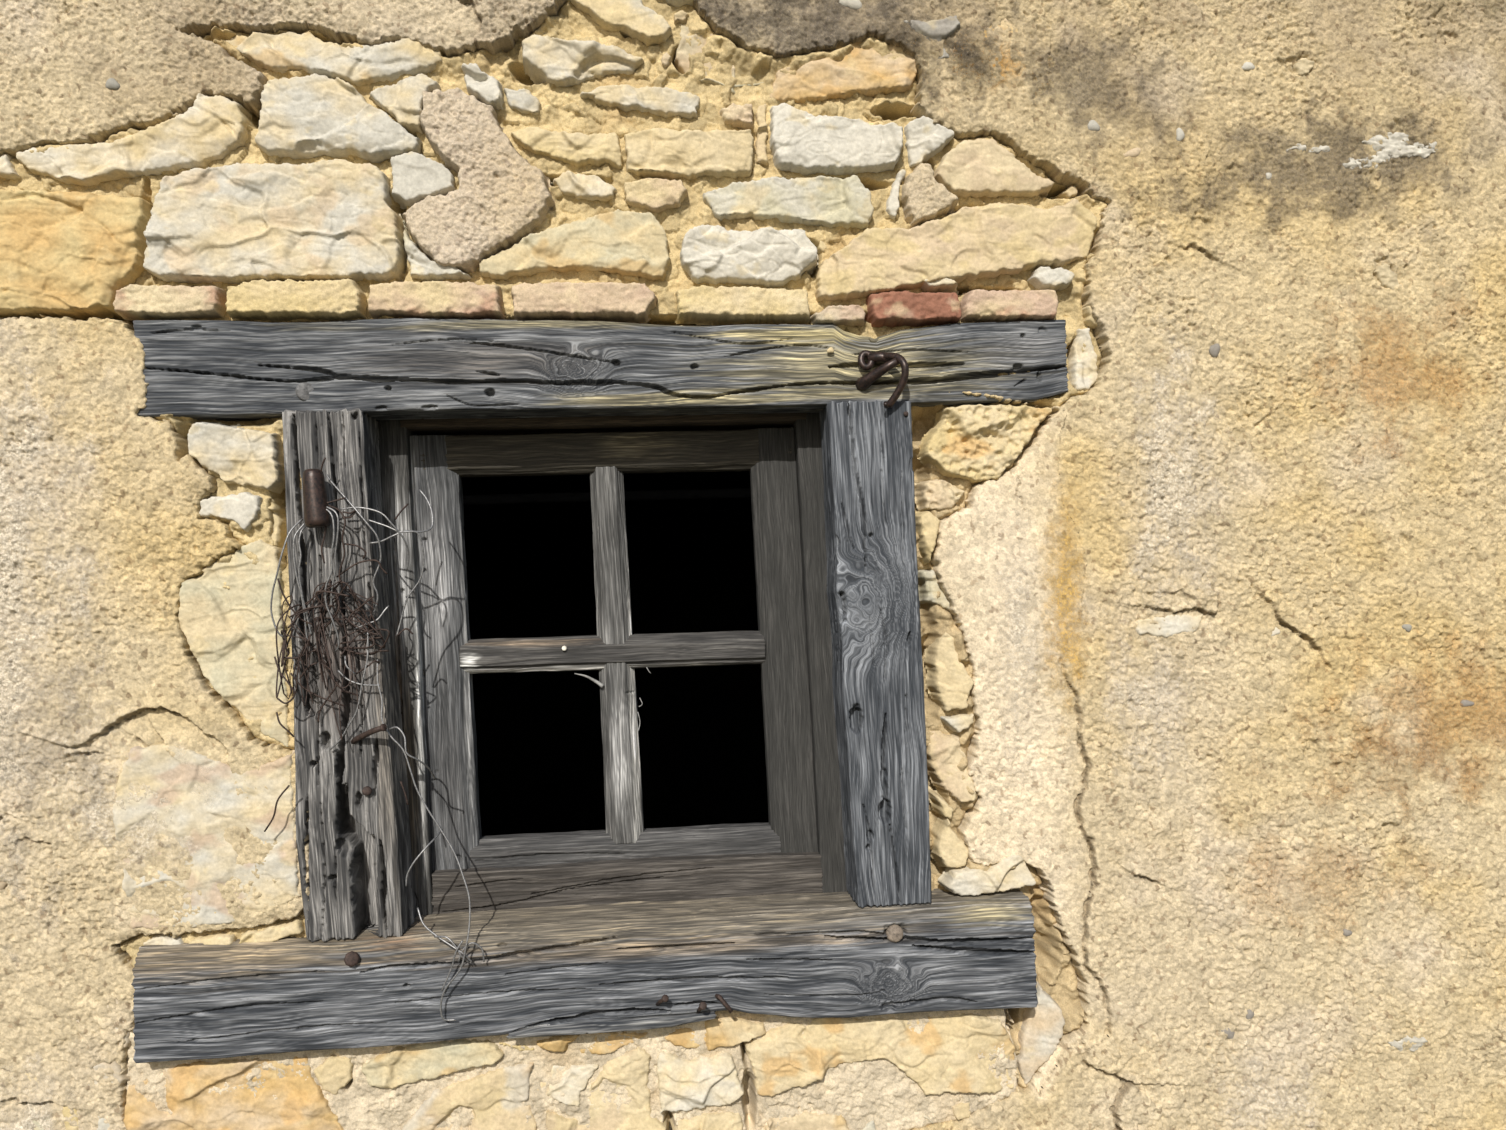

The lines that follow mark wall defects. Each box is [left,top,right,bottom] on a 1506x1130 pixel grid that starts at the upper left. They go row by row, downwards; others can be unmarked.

flaking render [1286,143,1330,154]
flaking render [1340,132,1438,170]
flaking render [0,0,1111,1130]